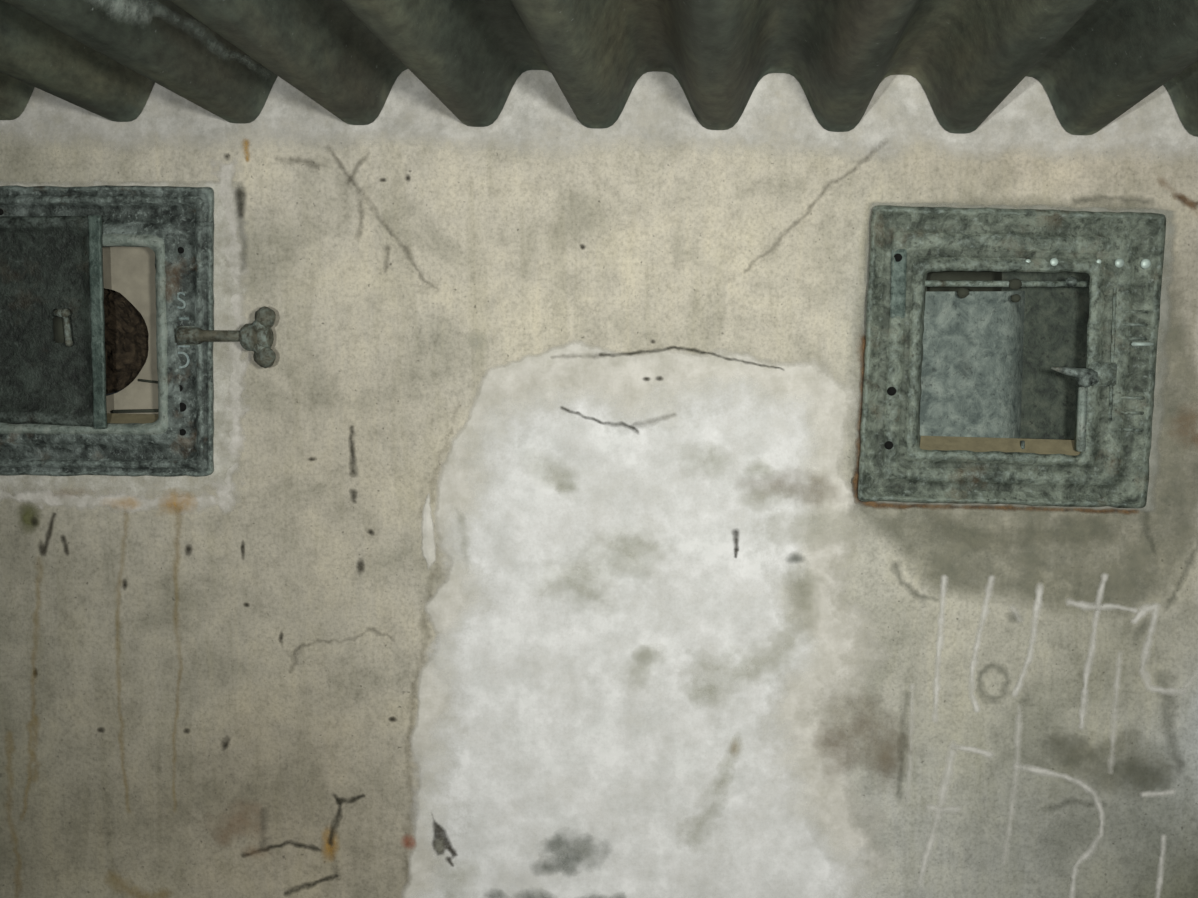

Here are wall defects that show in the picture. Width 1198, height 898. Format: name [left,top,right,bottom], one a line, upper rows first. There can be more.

crack [600,341,779,368]
water stain [884,318,1198,603]
peeling [403,342,883,898]
crack [246,795,364,895]